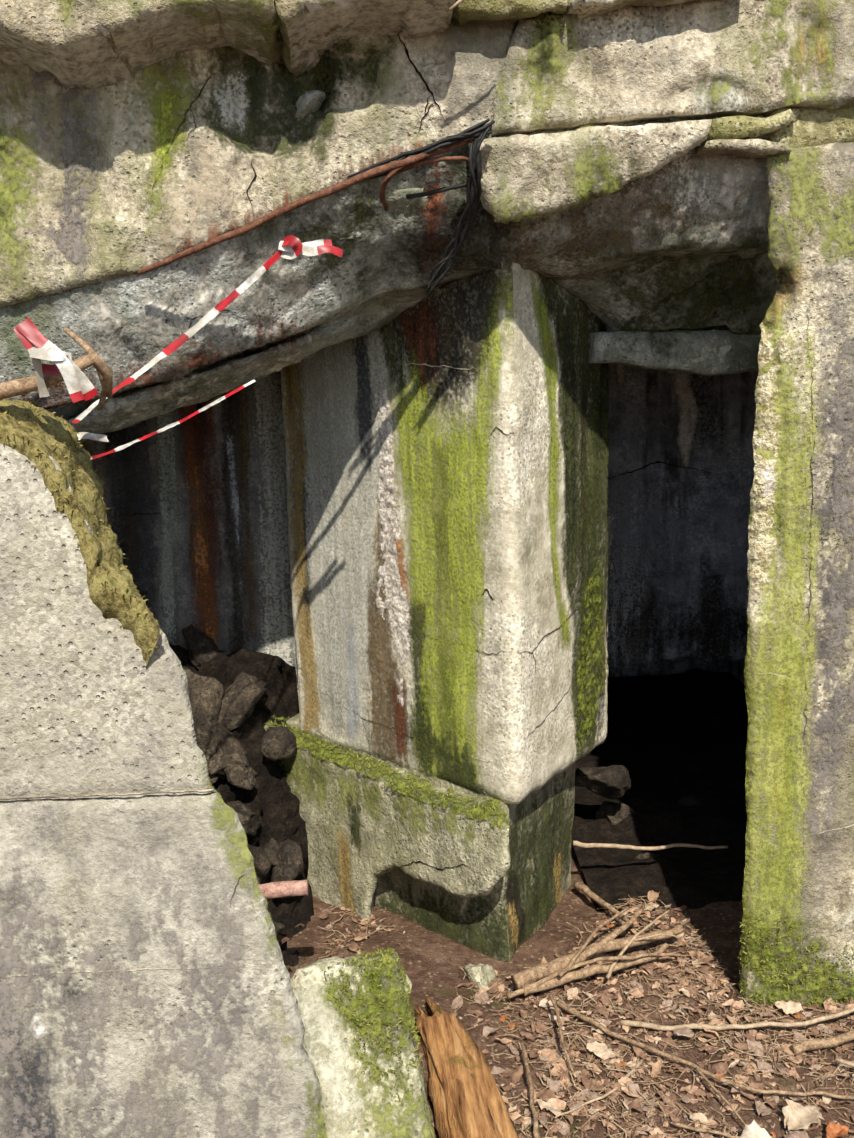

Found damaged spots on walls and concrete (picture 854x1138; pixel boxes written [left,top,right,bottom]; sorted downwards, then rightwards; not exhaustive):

crack [397,33,444,133]
crack [144,66,213,207]
corrosion [208,192,300,240]
corrosion [179,398,222,646]
water stain [79,152,772,796]
crack [608,461,718,480]
crack [476,608,578,661]
crack [398,861,486,876]